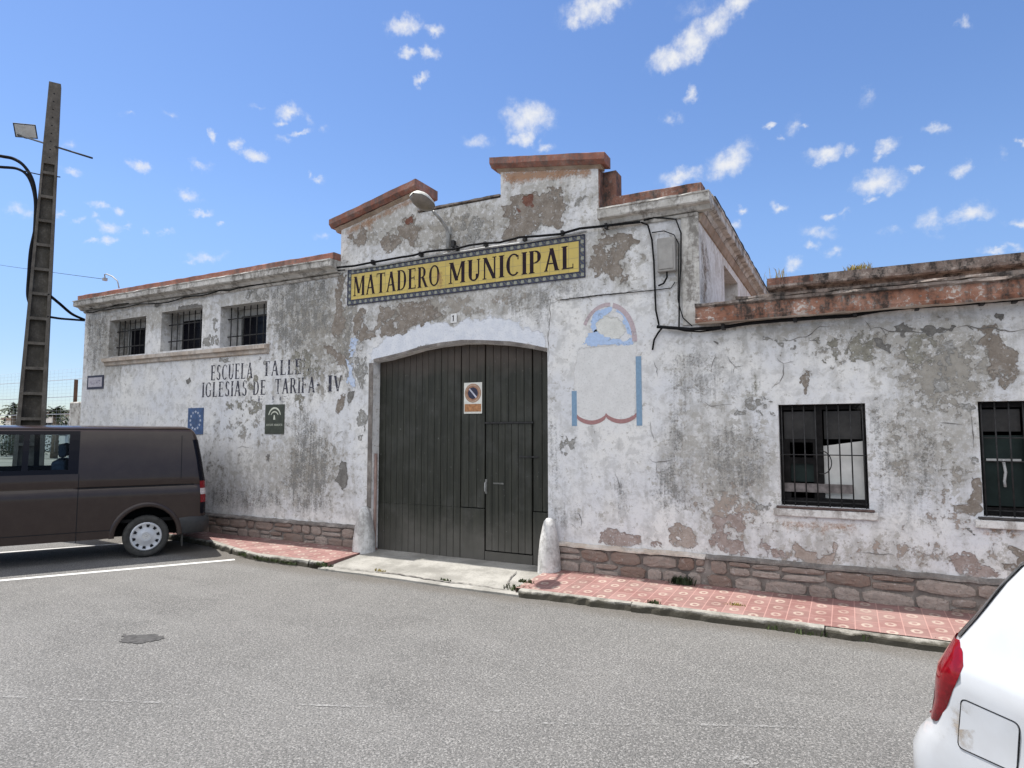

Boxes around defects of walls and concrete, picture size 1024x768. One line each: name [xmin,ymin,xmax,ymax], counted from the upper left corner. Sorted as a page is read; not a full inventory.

flaking render [347,225,368,247]
flaking render [380,214,422,253]
flaking render [501,185,586,242]
flaking render [588,229,640,284]
flaking render [977,313,1020,390]
spalling [335,460,348,490]
flaking render [598,512,838,565]
flaking render [949,545,1024,578]